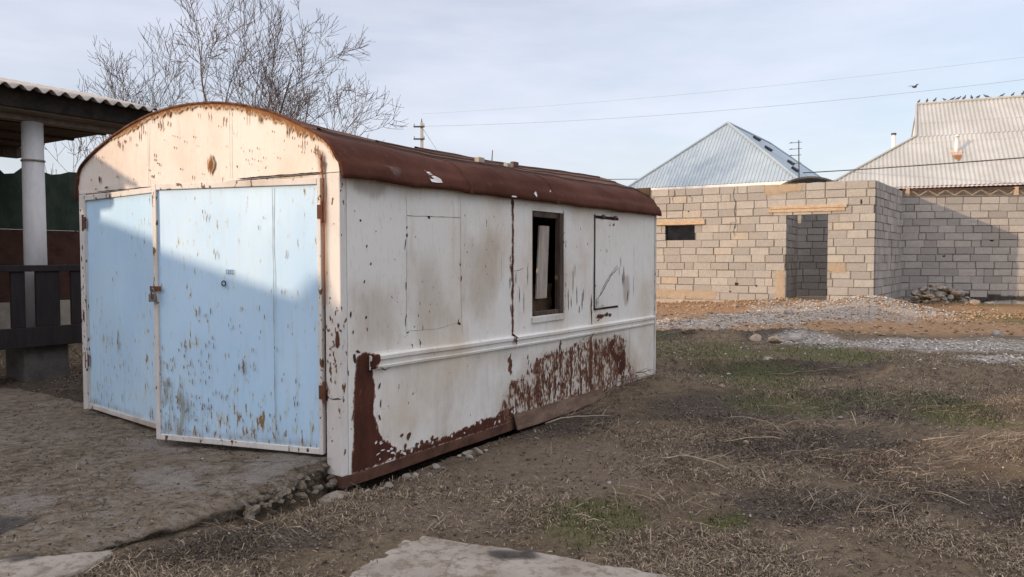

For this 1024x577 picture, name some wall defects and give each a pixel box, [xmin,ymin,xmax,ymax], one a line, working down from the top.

rust [105,104,334,288]
rust [160,337,228,437]
rust [352,352,444,474]
rust [501,199,638,423]